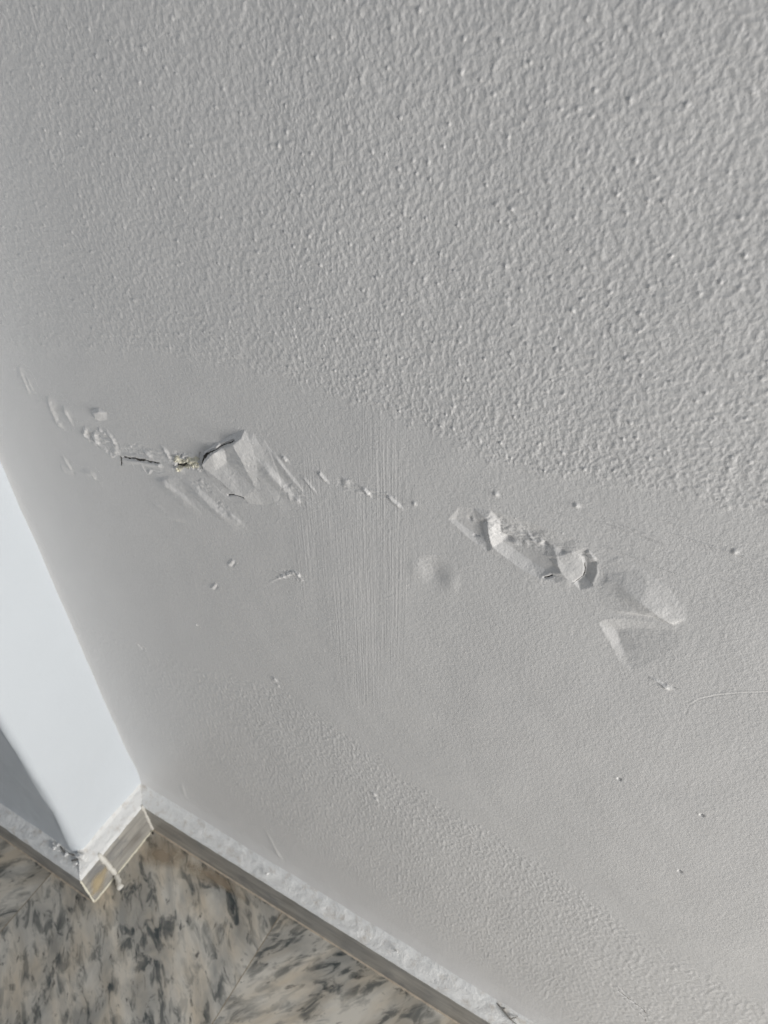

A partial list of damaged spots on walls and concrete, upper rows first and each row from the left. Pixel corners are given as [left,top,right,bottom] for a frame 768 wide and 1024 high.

crack [120,441,233,469]
peeling [79,406,407,518]
spalling [437,504,602,594]